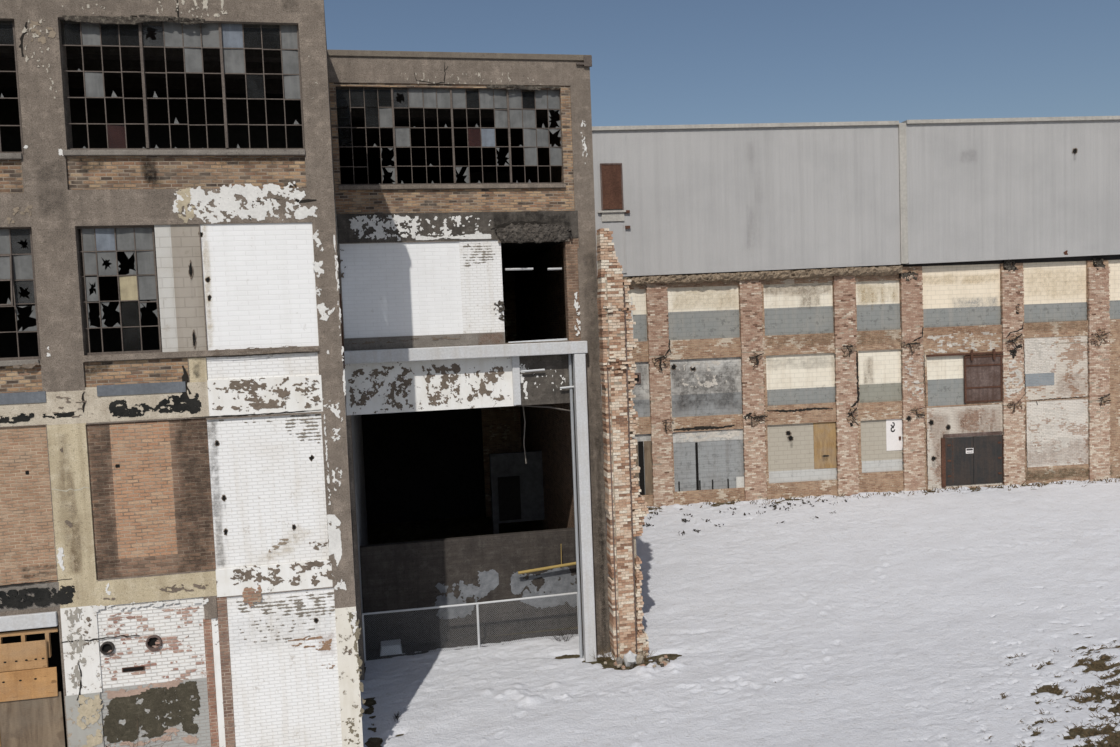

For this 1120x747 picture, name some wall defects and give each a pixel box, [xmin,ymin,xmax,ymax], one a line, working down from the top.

peeling [172,181,505,744]
peeling [520,364,565,399]
peeling [64,583,209,747]
peeling [435,567,577,619]